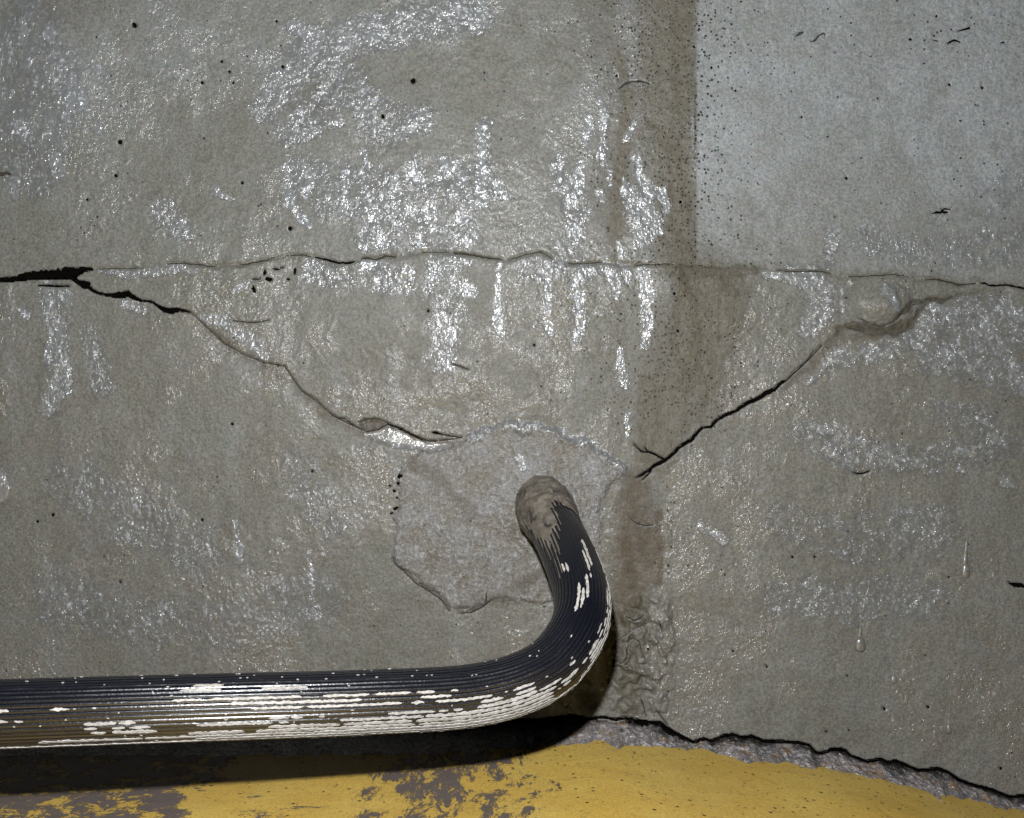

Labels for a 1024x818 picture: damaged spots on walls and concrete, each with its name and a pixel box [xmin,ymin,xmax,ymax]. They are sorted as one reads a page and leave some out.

leakage [249,0,512,374]
crack [422,251,601,264]
crack [778,269,1024,289]
crack [0,254,461,442]
crack [634,345,822,480]
crack [541,698,1024,798]